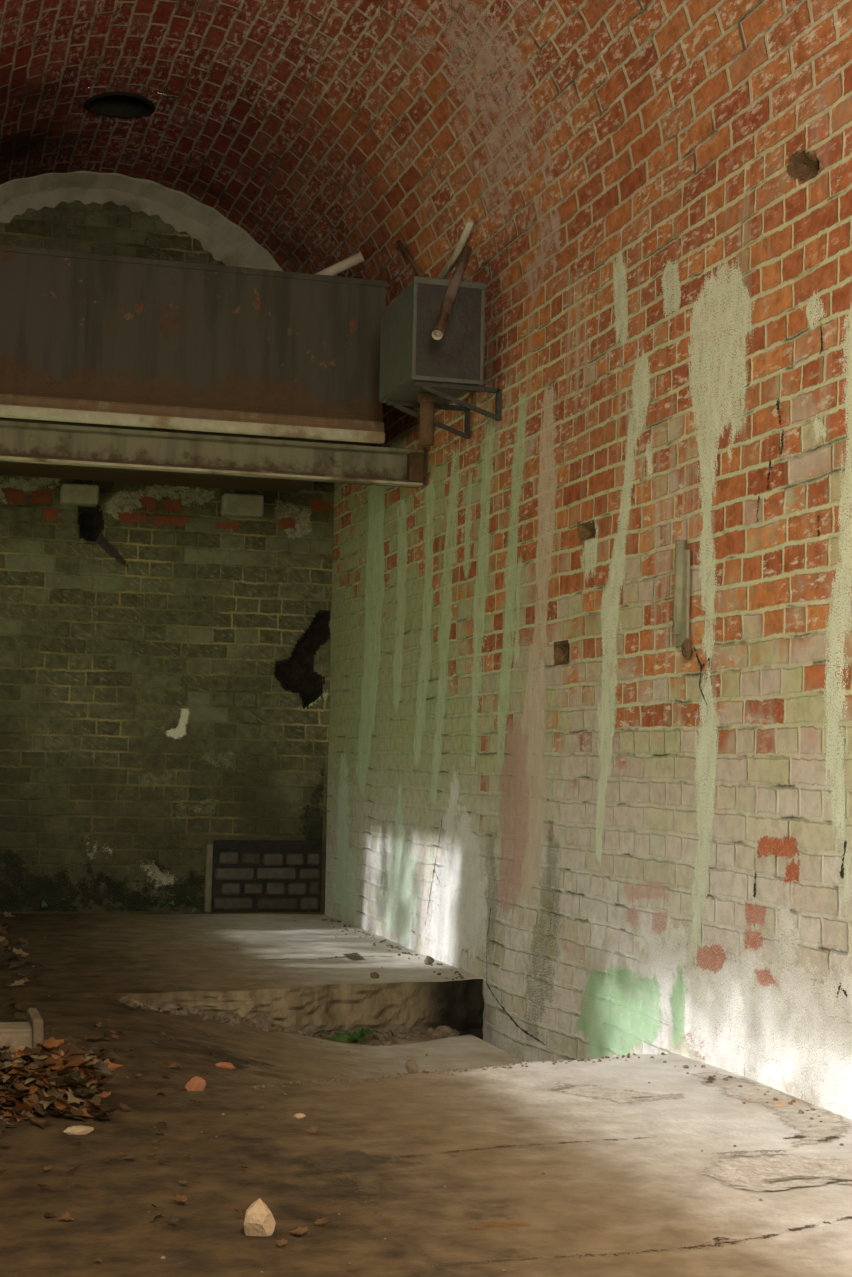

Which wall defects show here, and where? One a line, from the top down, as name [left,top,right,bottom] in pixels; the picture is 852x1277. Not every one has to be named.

peeling [0,476,61,521]
peeling [78,484,216,568]
spalling [275,610,330,710]
leakage [297,379,565,1042]
leakage [580,348,656,867]
leakage [629,255,852,1119]
leakage [0,837,206,912]
spalling [692,1072,852,1192]